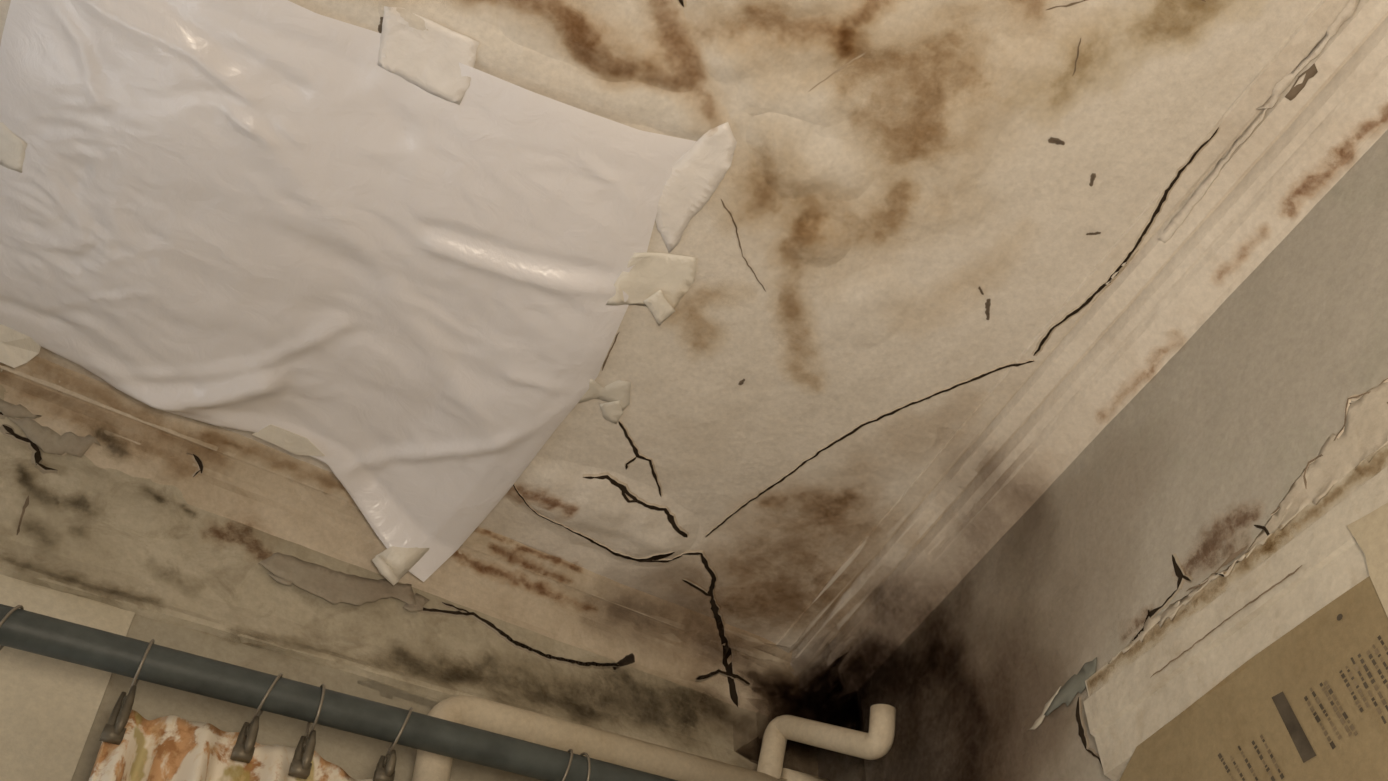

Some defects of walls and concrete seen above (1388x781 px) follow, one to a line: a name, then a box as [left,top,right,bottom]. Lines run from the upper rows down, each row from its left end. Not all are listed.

crack [1047,0,1087,10]
crack [1072,38,1081,76]
crack [0,411,58,535]
crack [513,127,1220,707]
peeling [1028,382,1388,731]
crack [418,602,620,669]
leakage [536,675,695,724]
leakage [749,644,1019,781]